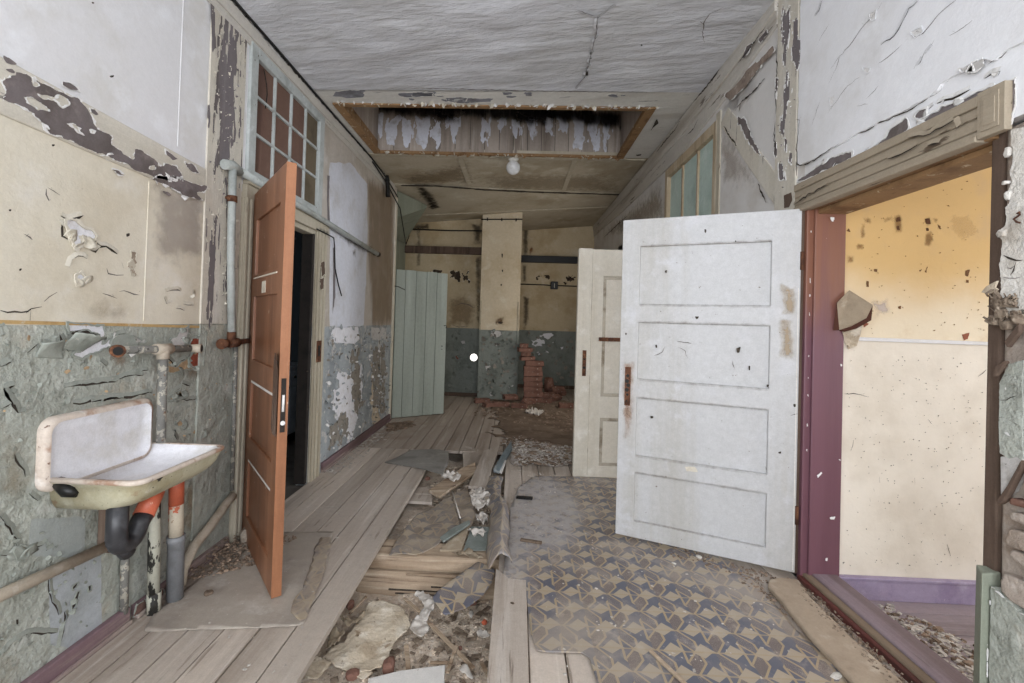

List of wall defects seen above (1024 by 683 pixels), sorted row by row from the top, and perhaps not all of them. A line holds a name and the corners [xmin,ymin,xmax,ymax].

leakage [379,107,621,129]
crack [404,4,641,93]
peeling [724,5,995,192]
crack [813,0,970,120]
crack [928,52,1006,109]
peeling [0,4,288,442]
peeling [320,162,391,451]
peeling [525,331,576,384]
peeling [0,516,102,648]